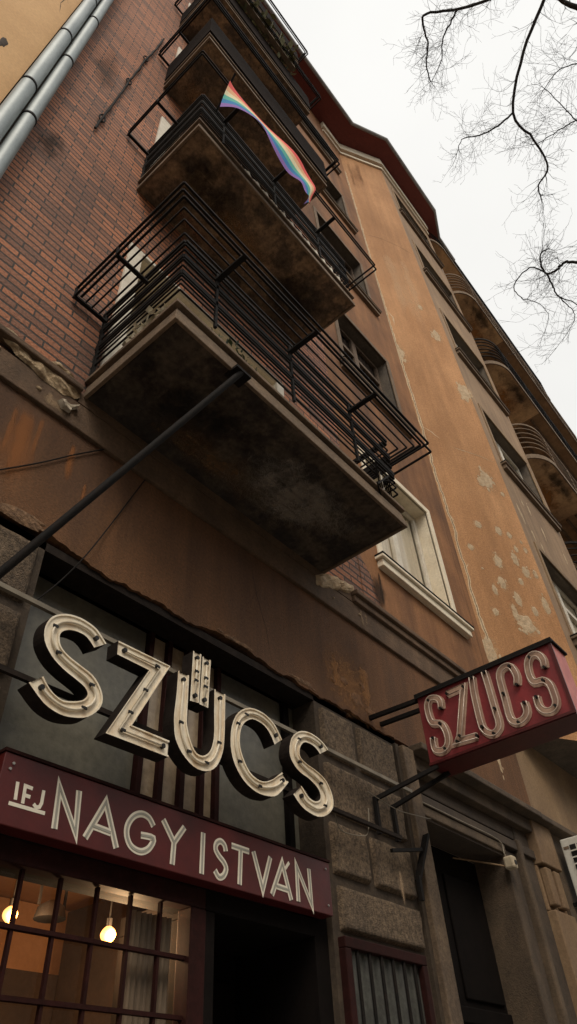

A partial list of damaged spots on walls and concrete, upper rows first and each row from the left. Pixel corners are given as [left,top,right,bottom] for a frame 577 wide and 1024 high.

spalling [0,327,80,413]
crack [345,172,489,663]
spalling [315,555,381,606]
spalling [481,501,551,635]